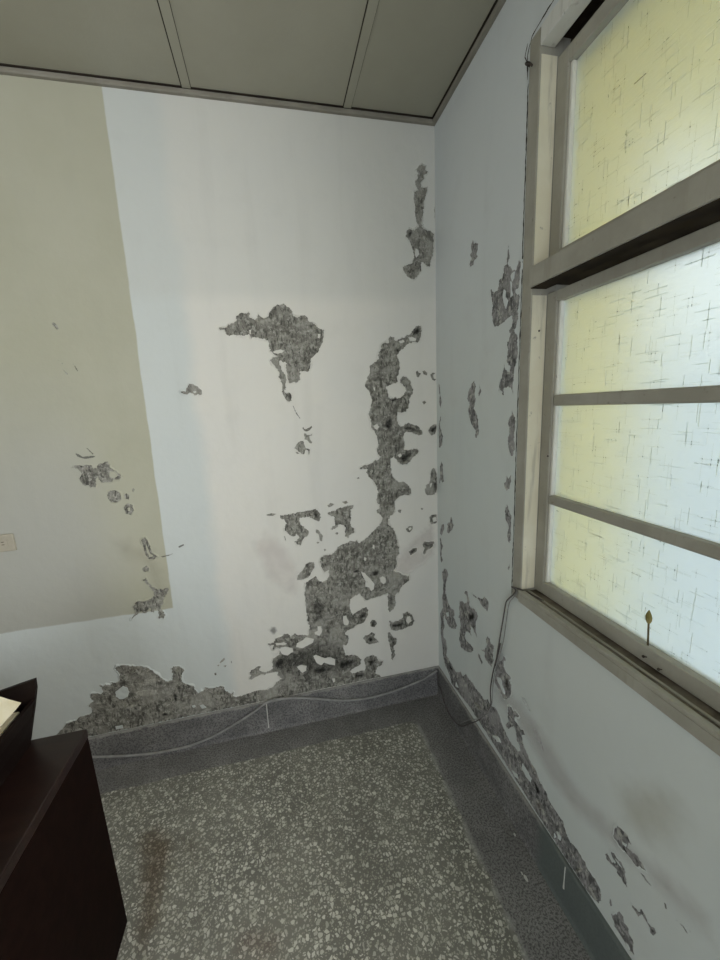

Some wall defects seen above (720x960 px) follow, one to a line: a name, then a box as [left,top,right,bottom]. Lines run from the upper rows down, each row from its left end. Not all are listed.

spalling [401,163,435,281]
peeling [490,244,523,397]
peeling [467,380,482,439]
spalling [54,303,437,737]
peeling [420,508,455,534]
peeling [504,504,513,544]
spalling [440,567,658,958]